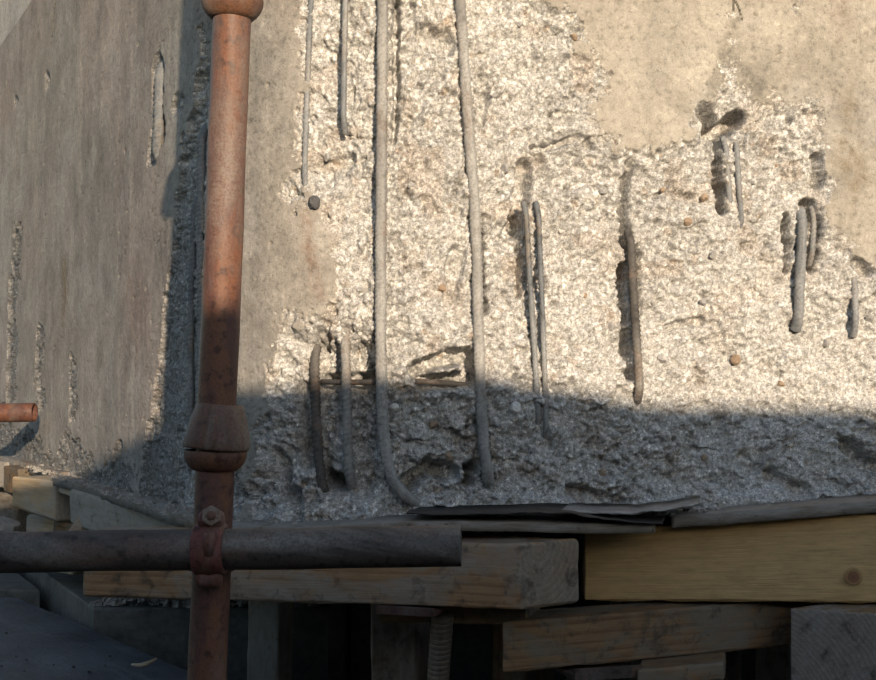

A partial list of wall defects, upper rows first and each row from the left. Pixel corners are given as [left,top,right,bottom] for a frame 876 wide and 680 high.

crack [732,0,743,21]
spalling [0,17,210,508]
spalling [233,0,876,522]